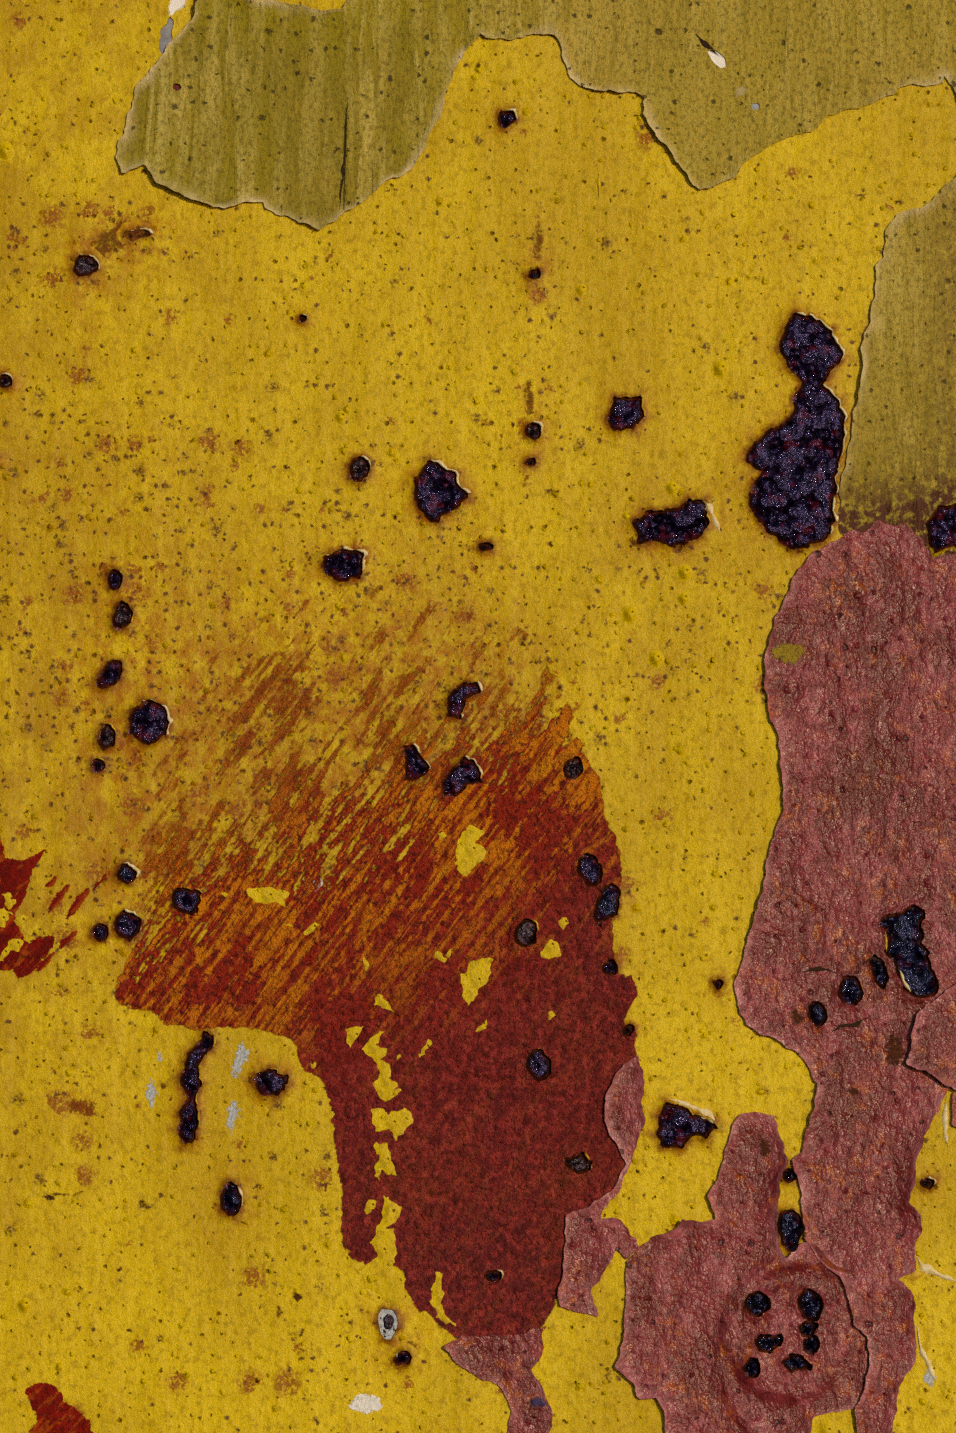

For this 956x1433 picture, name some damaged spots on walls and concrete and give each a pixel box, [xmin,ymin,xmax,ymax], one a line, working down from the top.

peeling [116,0,956,230]
spalling [0,372,13,388]
spalling [73,254,100,277]
peeling [92,177,956,1433]